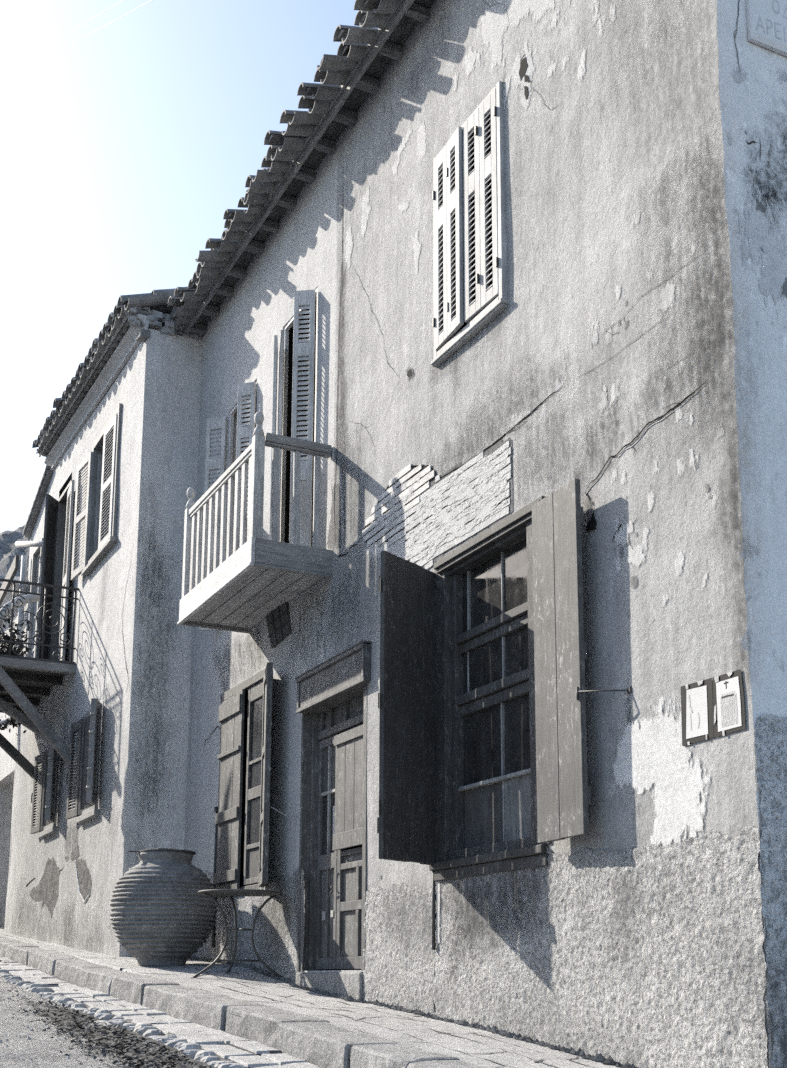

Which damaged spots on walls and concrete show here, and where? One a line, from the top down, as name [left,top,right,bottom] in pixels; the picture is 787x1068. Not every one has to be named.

flaking render [452,0,586,110]
flaking render [591,0,616,36]
crack [733,0,741,69]
damp [750,126,787,214]
crack [442,247,708,478]
flaking render [599,384,620,409]
flaking render [362,408,530,570]
crack [585,381,707,503]
flaking render [677,449,698,476]
flaking render [615,517,649,589]
flaking render [612,696,710,847]
flaking render [29,846,92,919]